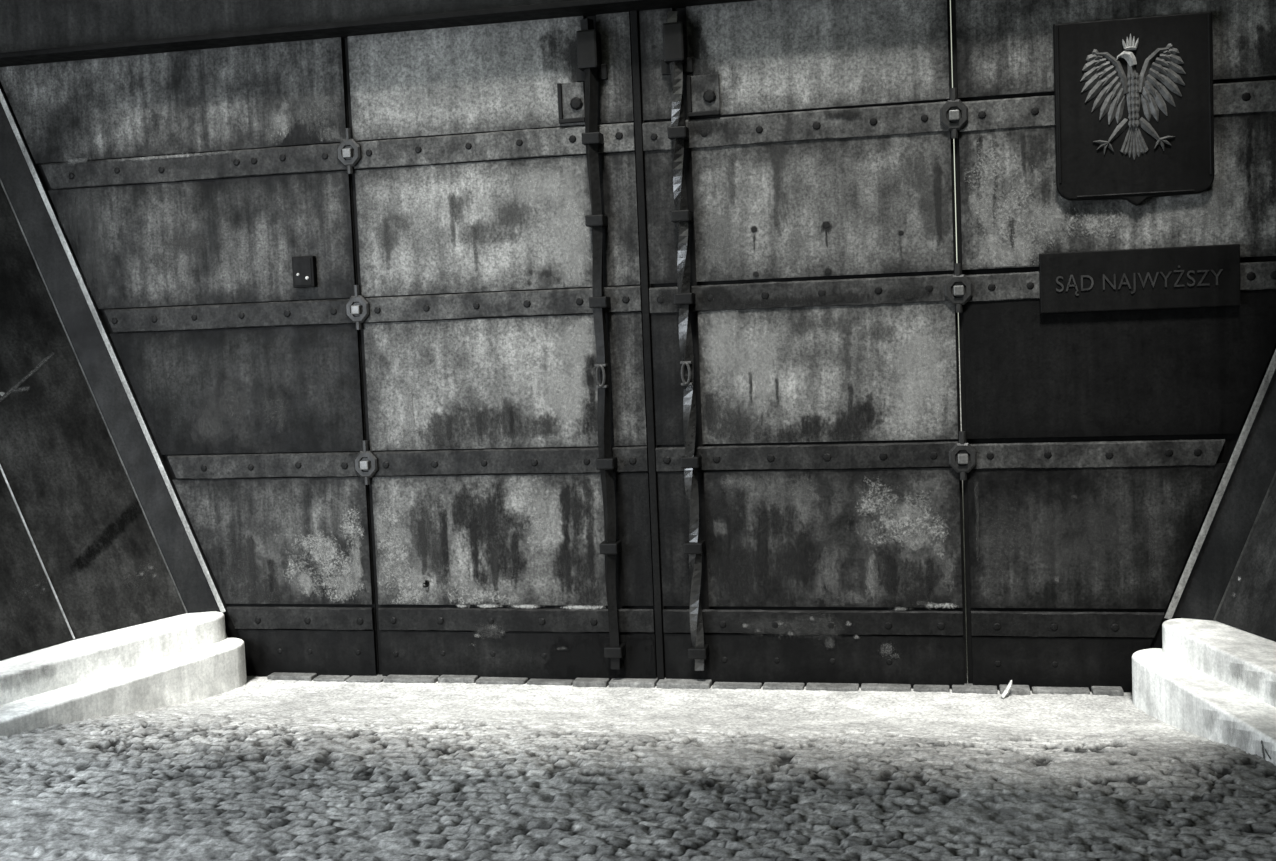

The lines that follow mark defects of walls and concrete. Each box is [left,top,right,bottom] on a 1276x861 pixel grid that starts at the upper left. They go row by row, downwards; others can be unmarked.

water stain [449,196,527,262]
water stain [401,385,556,448]
water stain [705,384,884,442]
water stain [409,479,529,608]
water stain [553,475,603,610]
water stain [709,490,820,606]